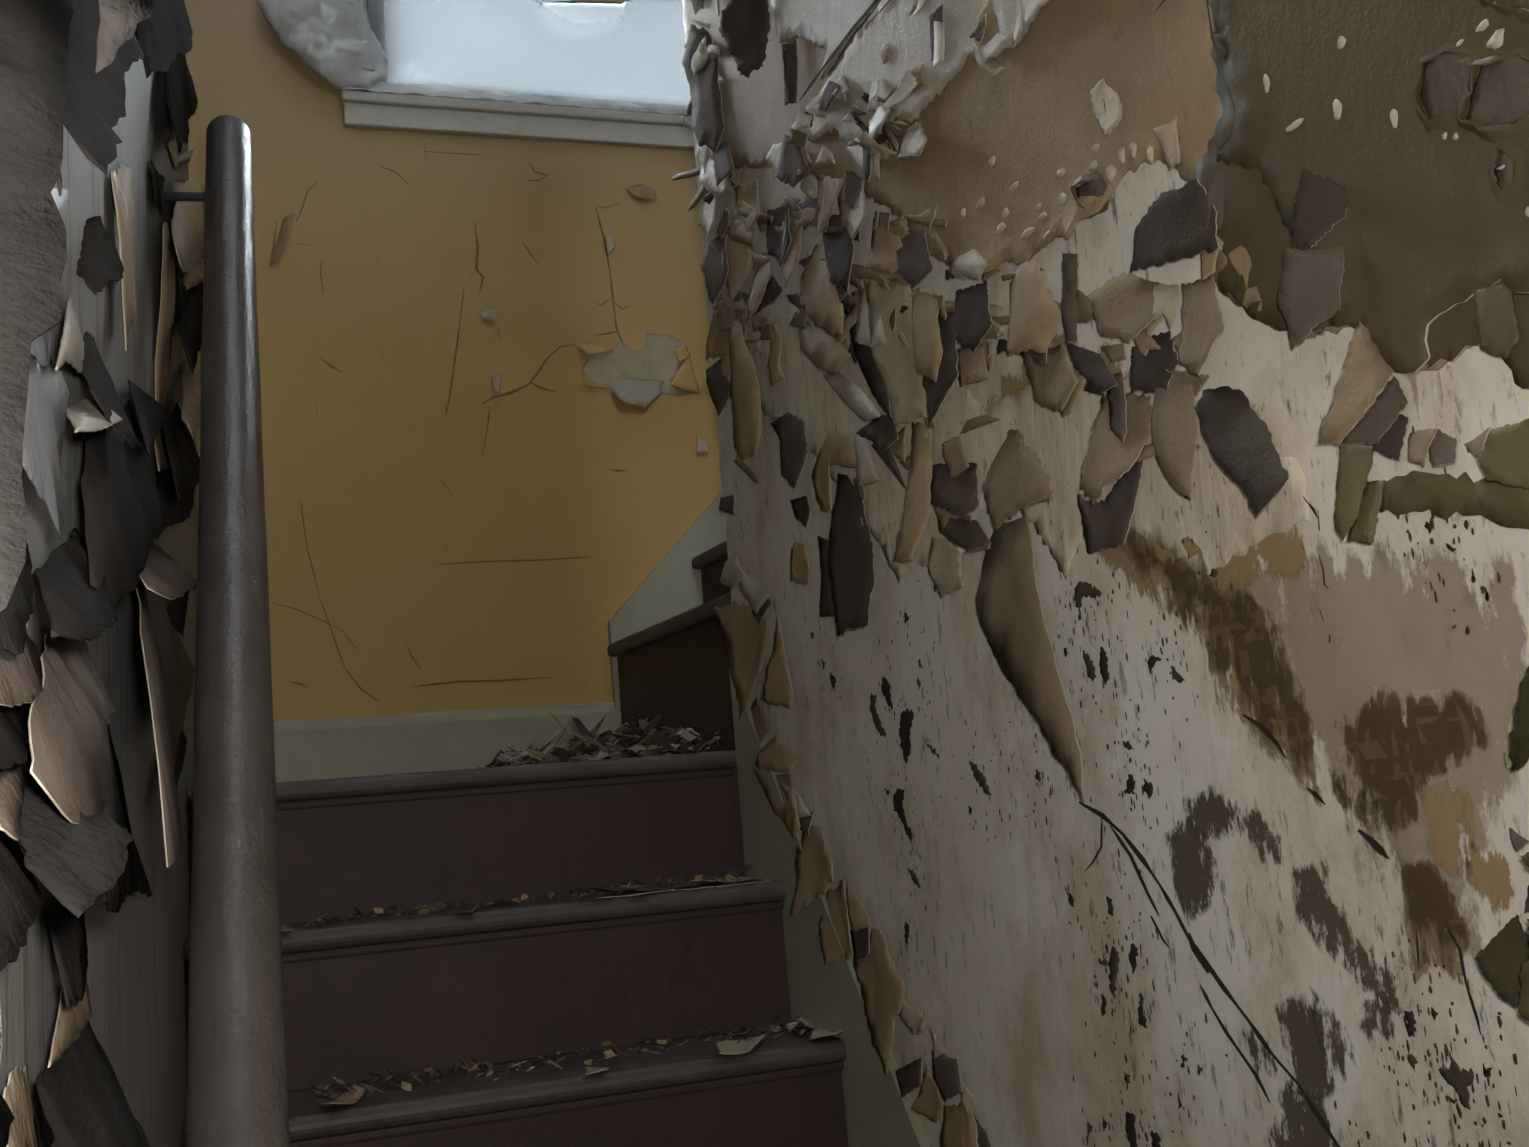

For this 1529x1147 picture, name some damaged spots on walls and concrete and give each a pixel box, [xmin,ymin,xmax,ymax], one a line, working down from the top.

crack [445,203,630,457]
peeling [575,0,1290,1147]
leakage [988,360,1031,406]
peeling [1278,167,1349,350]
peeling [1318,320,1529,635]
peeling [1474,280,1521,359]
peeling [1495,150,1513,190]
leakage [1099,525,1526,983]
leakage [1166,787,1410,1147]